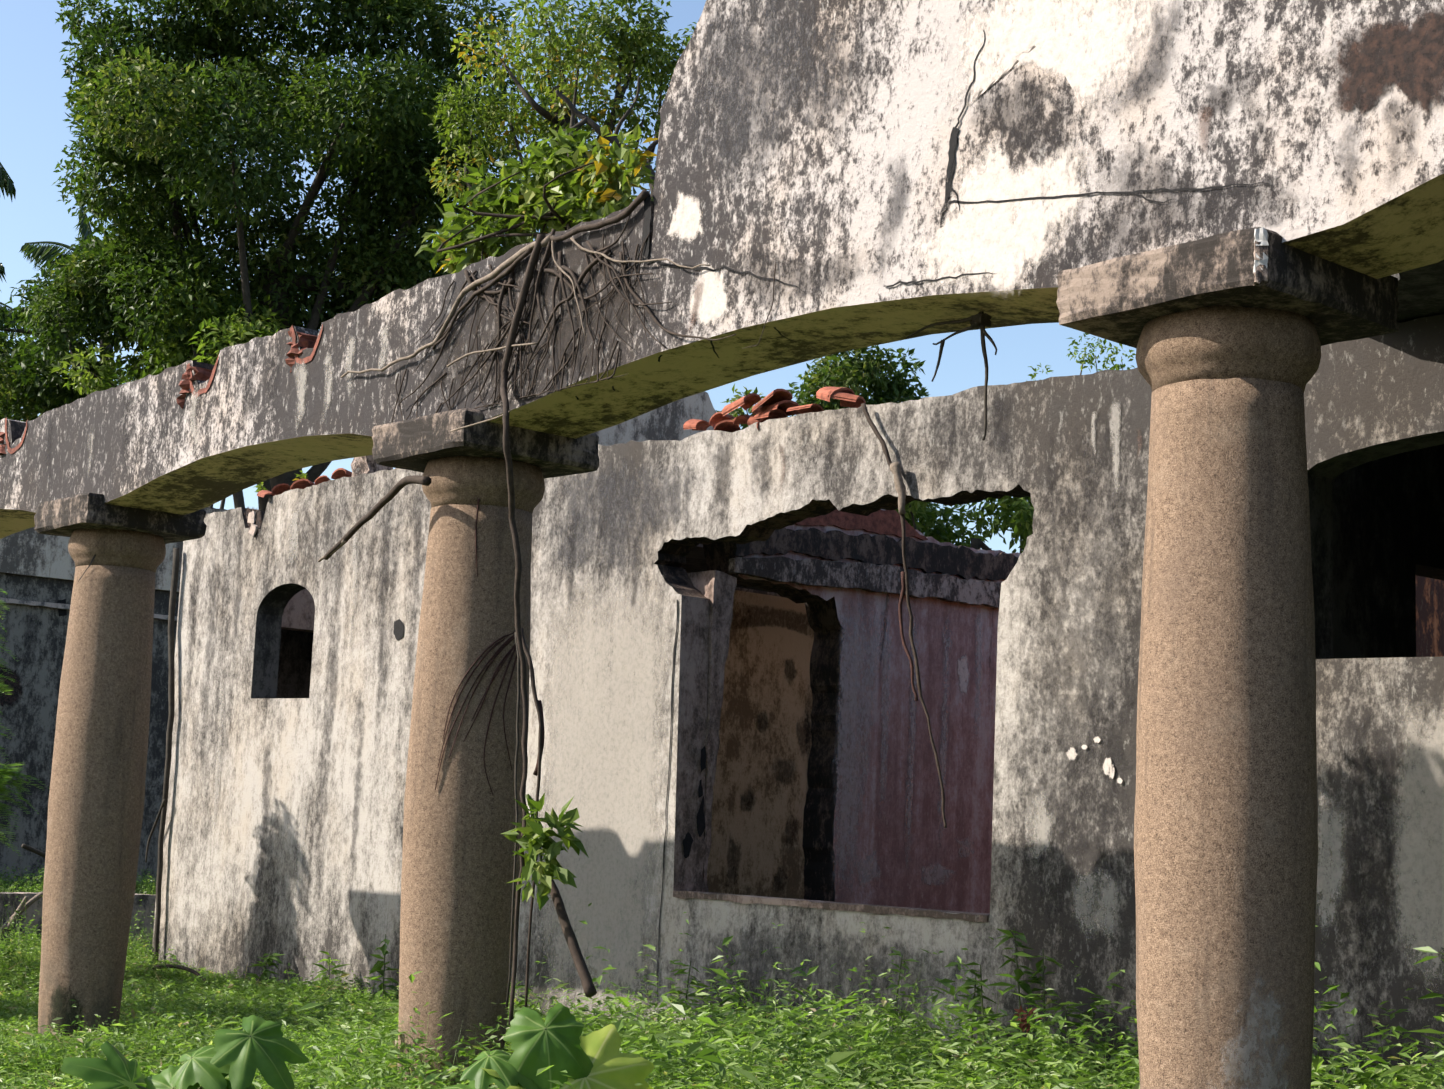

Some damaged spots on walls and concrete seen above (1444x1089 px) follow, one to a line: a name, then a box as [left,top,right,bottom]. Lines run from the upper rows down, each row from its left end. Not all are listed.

damp [1331,8,1444,113]
crack [883,27,1269,288]
damp [325,340,354,404]
peeling [1067,737,1100,760]
peeling [1103,758,1122,784]
damp [295,798,307,922]
damp [1317,796,1344,927]